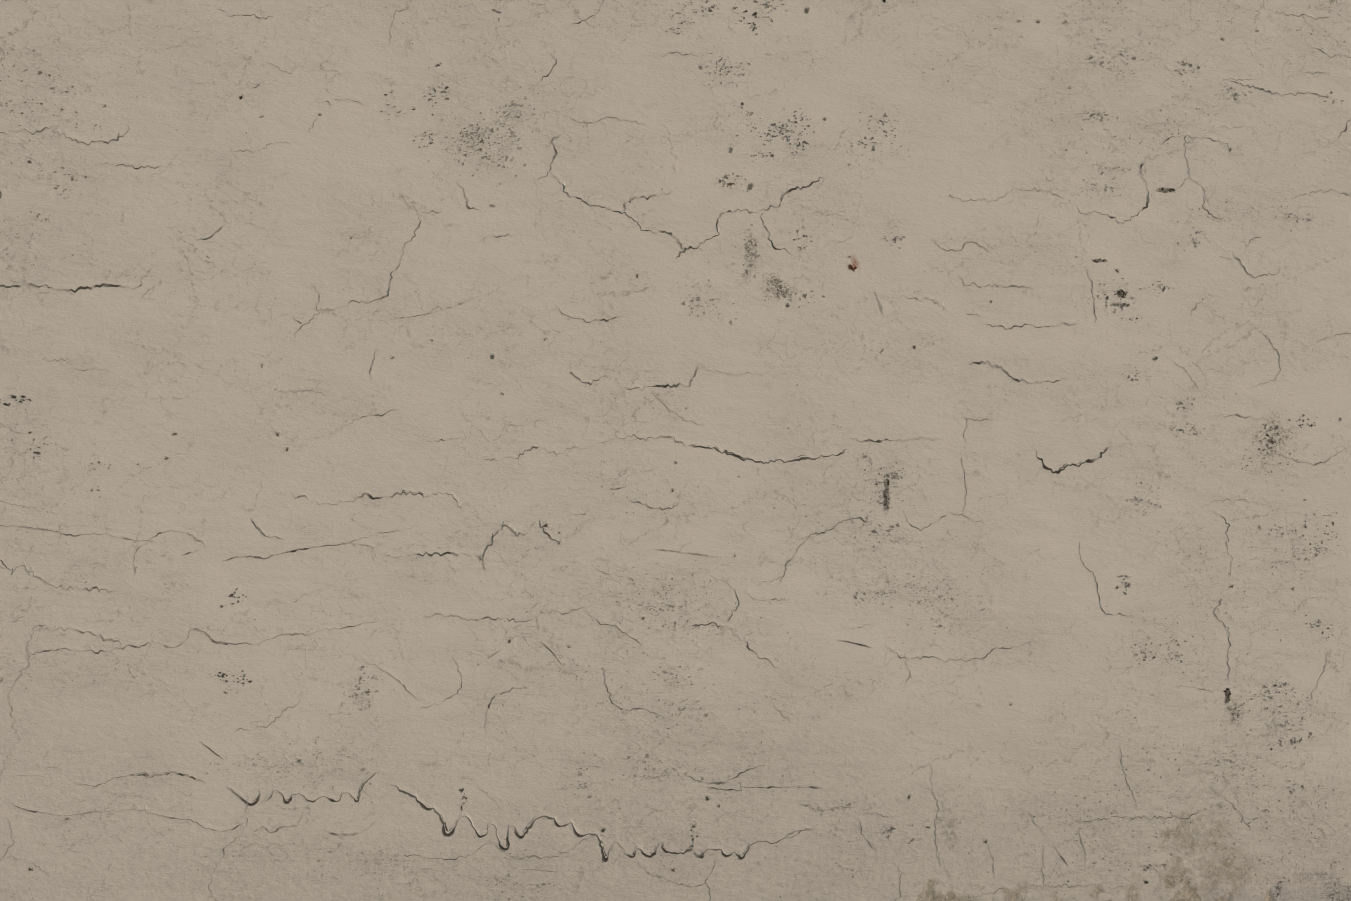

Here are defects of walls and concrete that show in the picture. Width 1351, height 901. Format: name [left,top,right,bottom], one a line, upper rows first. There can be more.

crack [537,112,826,259]
crack [0,262,156,293]
crack [570,364,699,391]
crack [314,349,399,439]
crack [1036,446,1109,474]
crack [290,487,464,512]
crack [380,479,681,571]
crack [482,412,994,668]
crack [0,560,119,592]
crack [0,620,154,776]
crack [404,836,593,860]